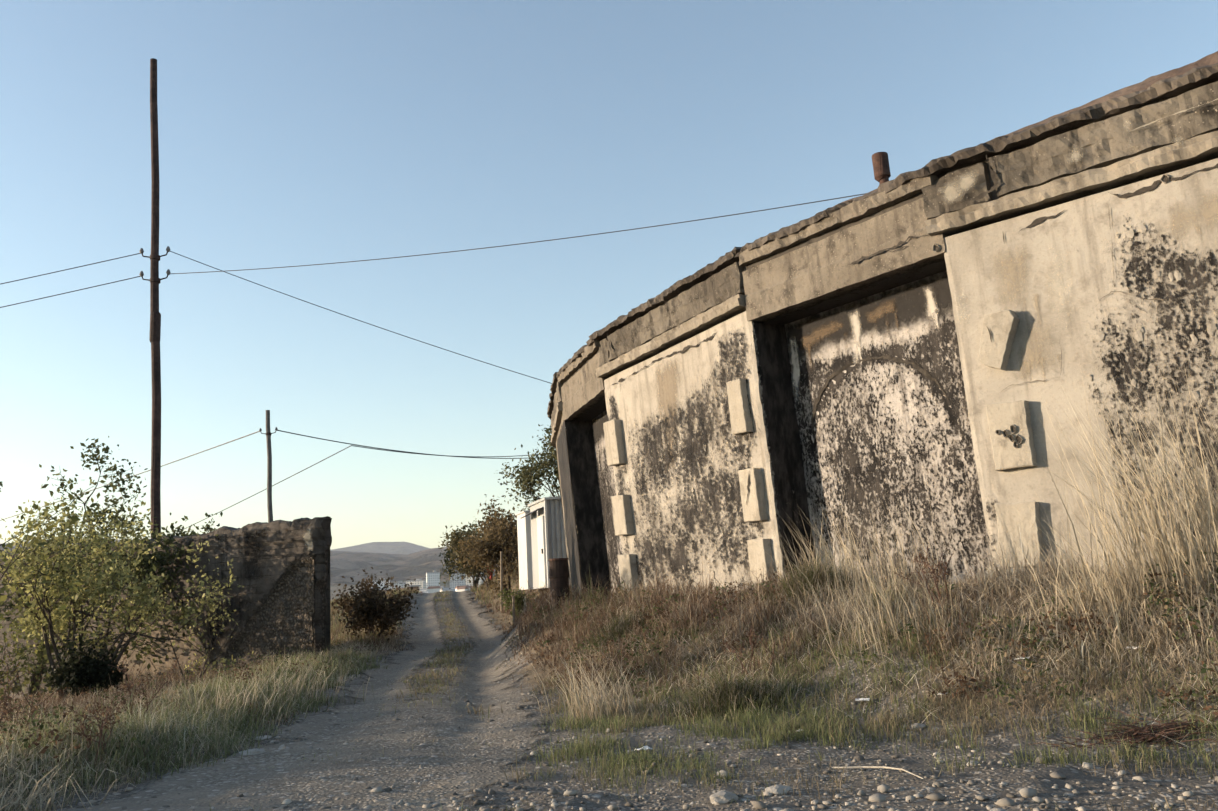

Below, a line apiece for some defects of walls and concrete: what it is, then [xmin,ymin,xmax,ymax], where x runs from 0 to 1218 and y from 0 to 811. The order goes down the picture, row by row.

crack [1096,163,1218,311]
damp [926,289,938,326]
damp [791,340,800,386]
damp [851,312,862,363]
damp [657,364,677,462]